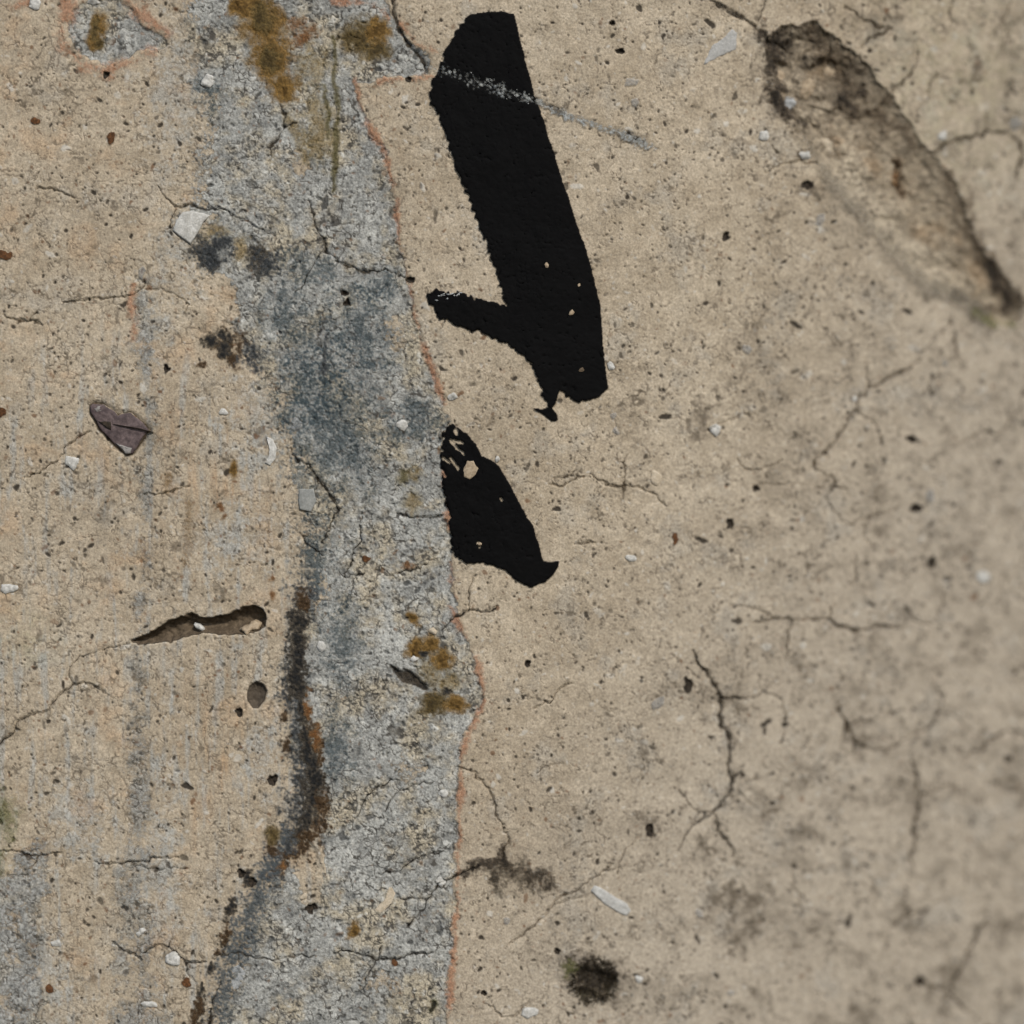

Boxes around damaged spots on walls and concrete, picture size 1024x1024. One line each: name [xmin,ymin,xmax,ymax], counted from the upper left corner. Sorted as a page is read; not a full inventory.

leakage [189,233,282,282]
spalling [757,22,1023,330]
leakage [196,326,268,375]
flaking render [173,0,484,1024]
crack [813,367,912,534]
crack [0,643,130,744]
spalling [131,606,266,692]
crack [679,651,787,854]
flaking render [107,716,165,1024]
leakage [462,844,513,878]